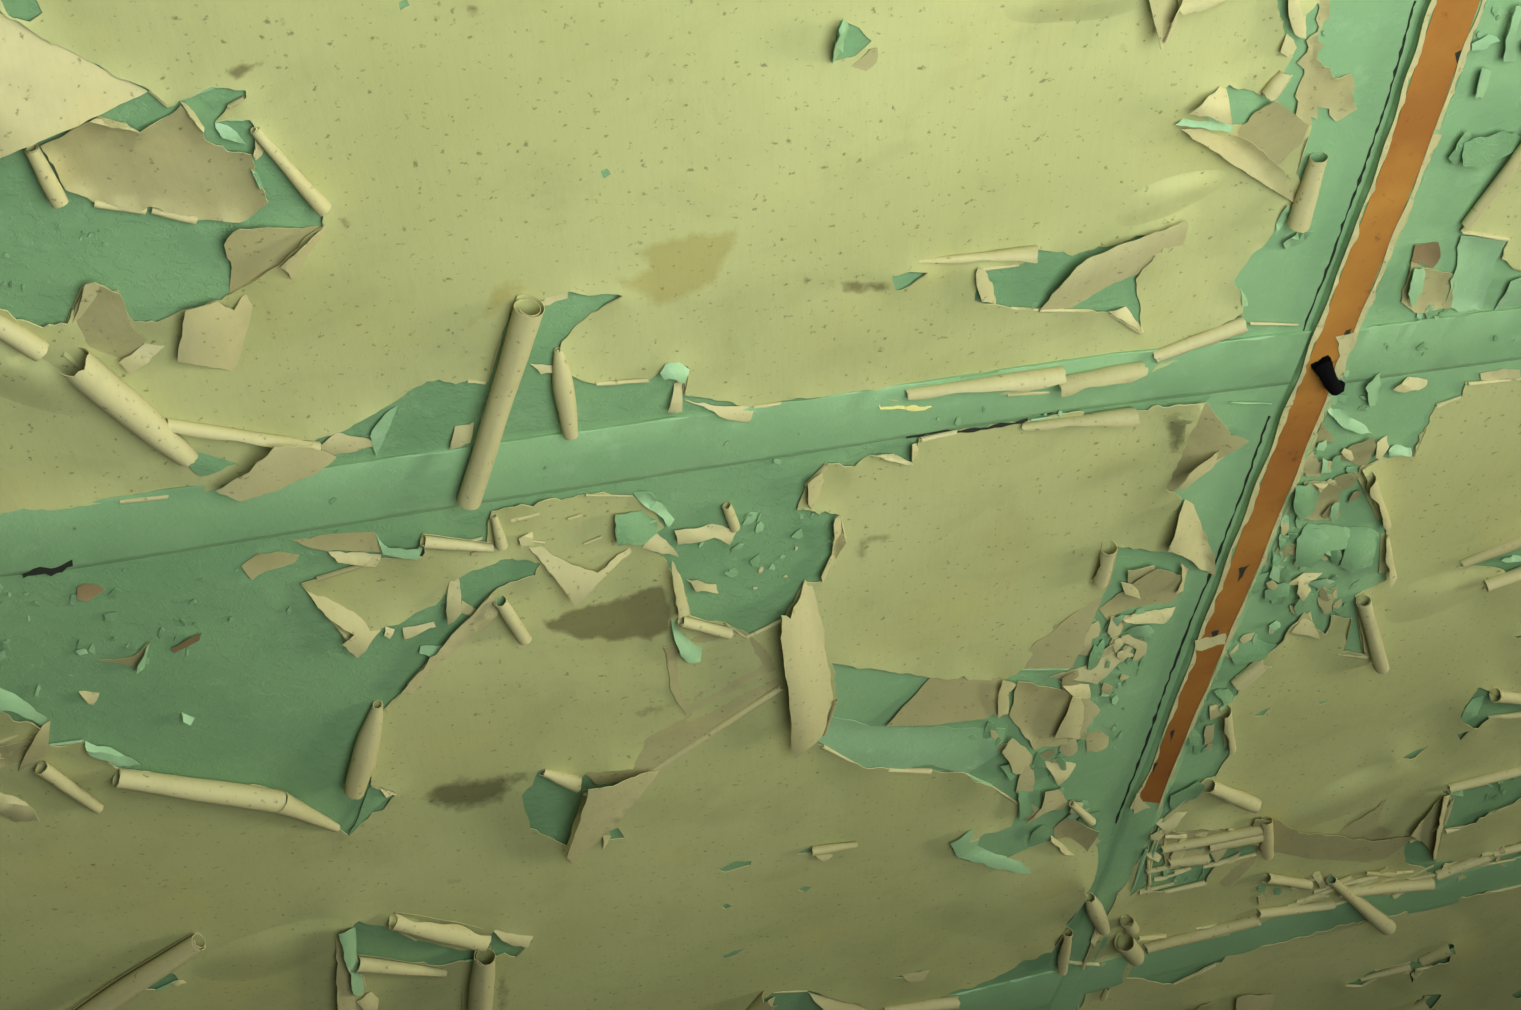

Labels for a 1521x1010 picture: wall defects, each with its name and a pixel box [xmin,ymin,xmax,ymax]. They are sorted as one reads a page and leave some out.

peeling [0,0,331,374]
peeling [892,221,1188,334]
peeling [0,292,1289,1010]
peeling [1115,0,1521,966]
peeling [1345,944,1455,1010]